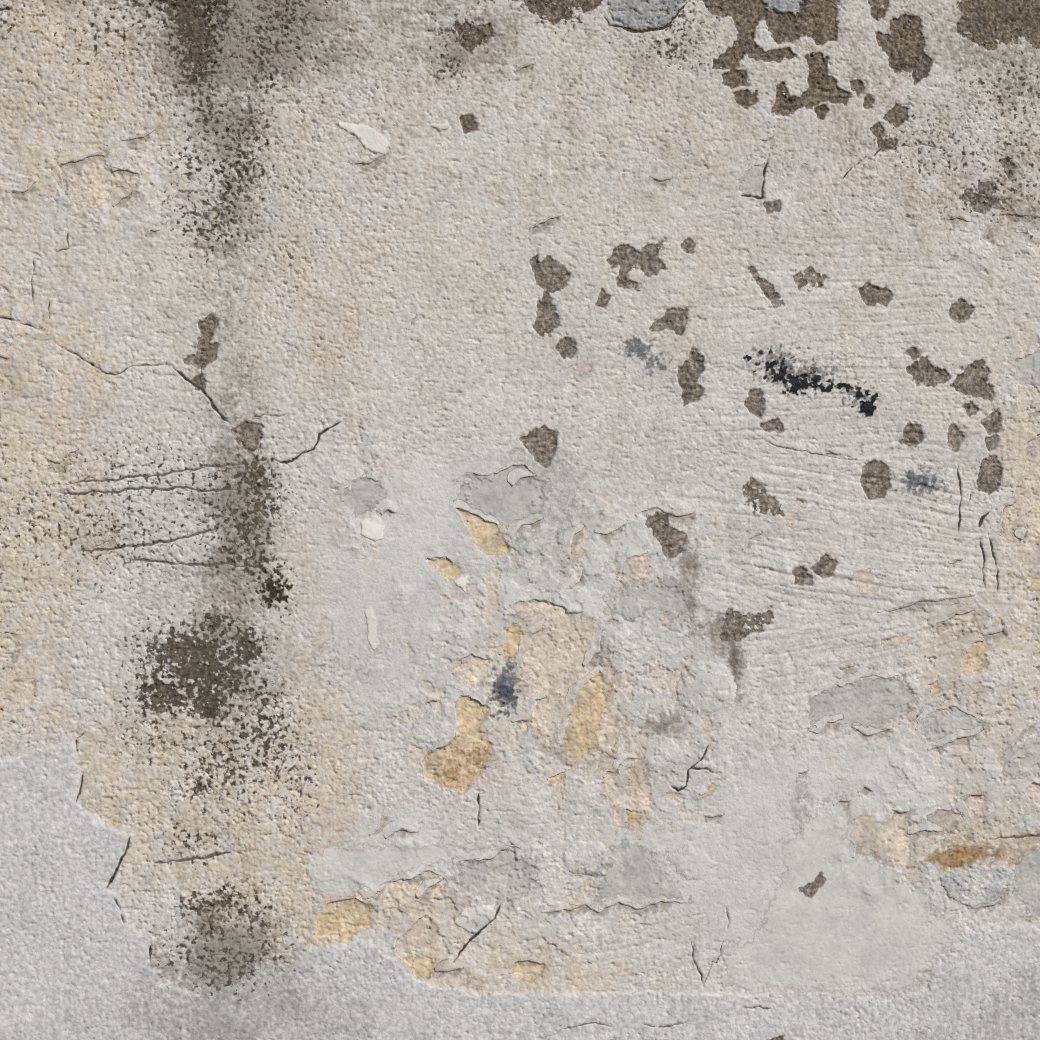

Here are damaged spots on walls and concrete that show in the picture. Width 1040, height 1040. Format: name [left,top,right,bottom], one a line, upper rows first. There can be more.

spalling [703,0,875,120]
spalling [868,0,932,85]
spalling [530,255,592,376]
crack [67,350,227,421]
damp [0,439,297,618]
crack [64,463,256,567]
crack [277,422,341,464]
peeling [906,347,1040,594]
crack [957,464,999,590]
peeling [415,425,700,839]
damp [116,601,320,869]
damp [157,876,298,1040]